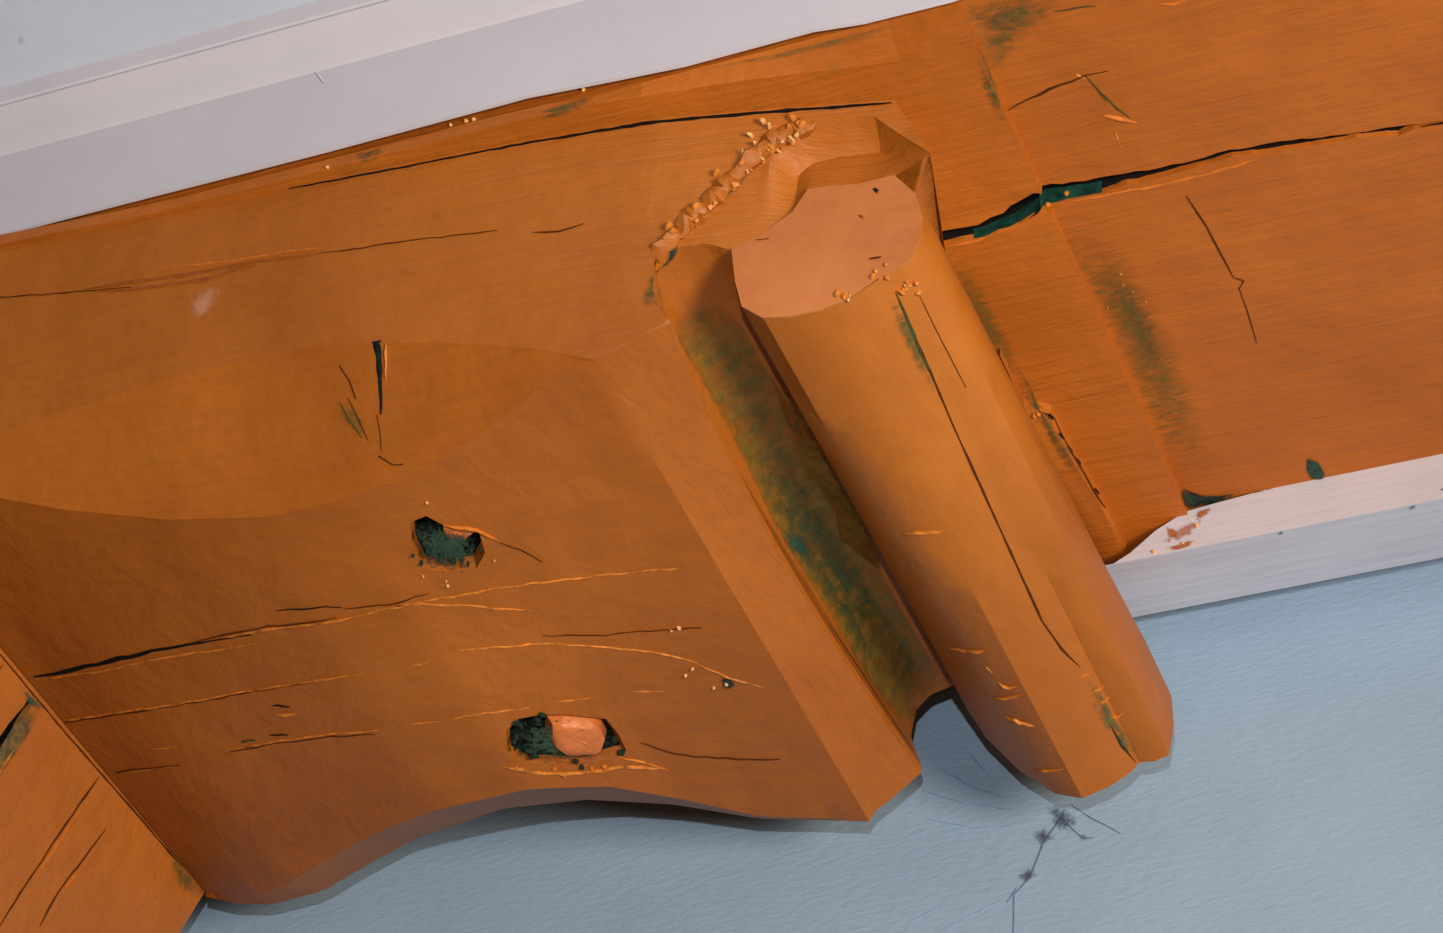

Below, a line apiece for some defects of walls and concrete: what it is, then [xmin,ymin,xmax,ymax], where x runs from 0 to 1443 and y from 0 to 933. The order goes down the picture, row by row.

peeling [649,113,818,297]
crack [942,71,1443,343]
crack [908,295,1080,667]
crack [1032,412,1106,508]
crack [0,540,780,926]
crack [941,804,1121,933]